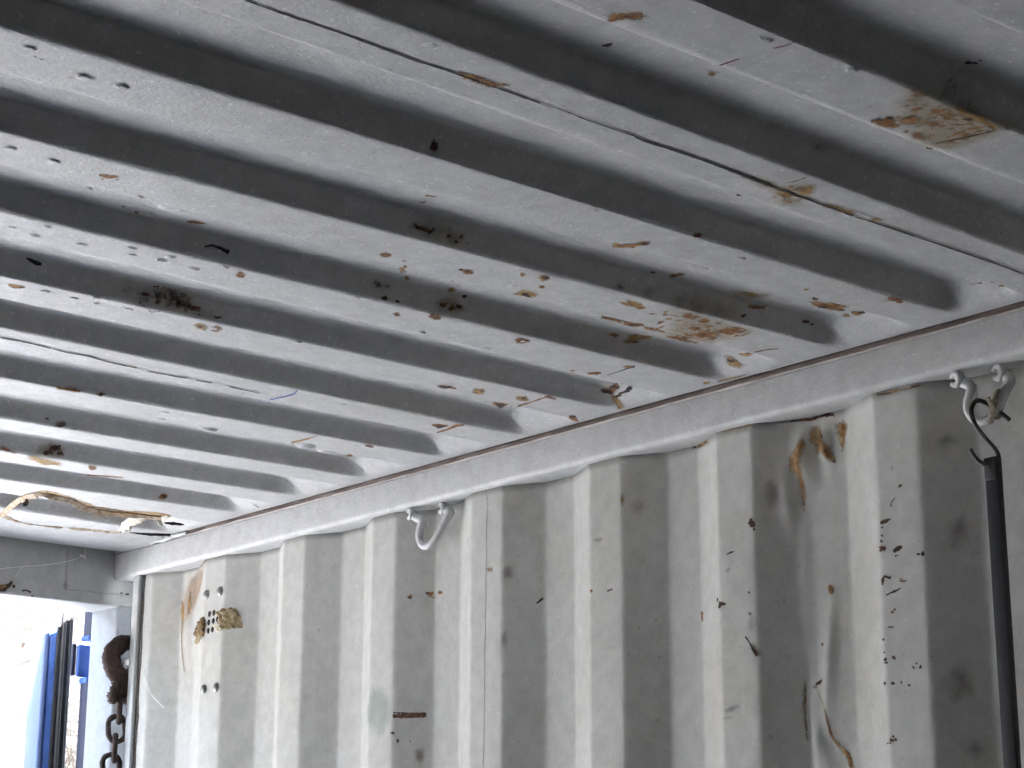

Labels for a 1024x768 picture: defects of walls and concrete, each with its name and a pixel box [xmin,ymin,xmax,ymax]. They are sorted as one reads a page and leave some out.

crack [245,0,1024,274]
corrosion [870,91,1009,149]
corrosion [142,286,222,332]
corrosion [428,281,467,320]
corrosion [515,275,549,298]
corrosion [601,291,767,344]
corrosion [789,413,847,511]
corrosion [820,697,854,767]